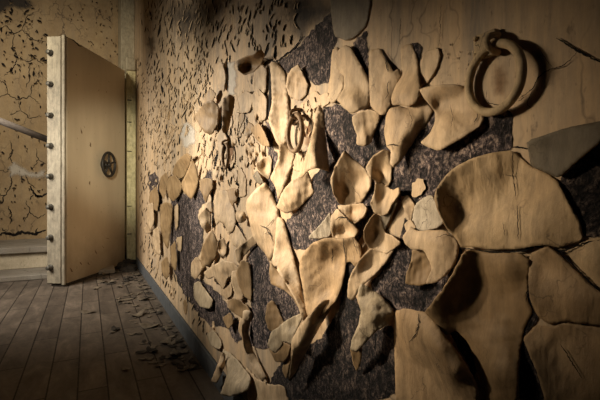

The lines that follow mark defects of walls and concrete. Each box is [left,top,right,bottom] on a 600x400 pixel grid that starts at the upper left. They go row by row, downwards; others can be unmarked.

crack [0,13,45,119]
crack [519,38,600,108]
crack [0,142,47,236]
peeling [135,0,600,400]